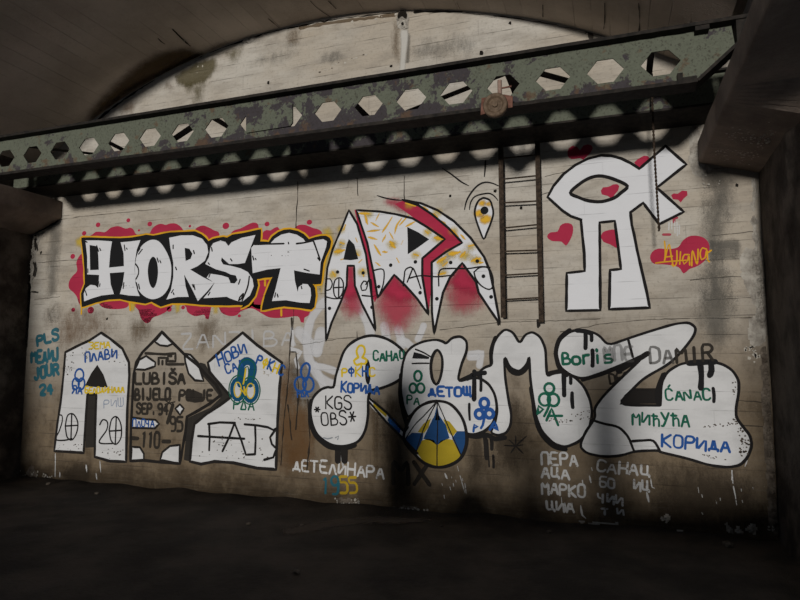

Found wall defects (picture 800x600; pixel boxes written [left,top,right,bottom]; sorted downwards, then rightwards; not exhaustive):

spalling [375,10,409,70]
leakage [176,59,215,94]
spalling [688,125,720,188]